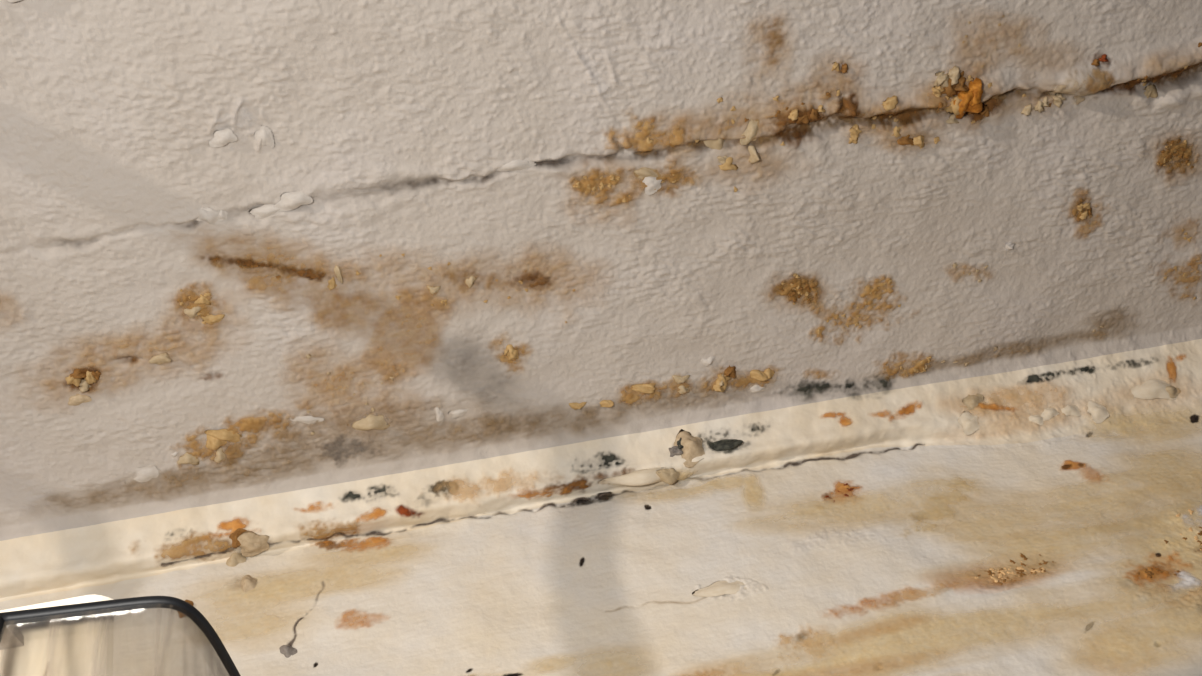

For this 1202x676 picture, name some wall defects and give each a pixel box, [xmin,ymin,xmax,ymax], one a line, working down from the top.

crack [1107,62,1202,99]
crack [605,66,1066,195]
crack [482,158,566,182]
crack [193,190,313,225]
spalling [65,355,101,406]
peeling [569,356,775,410]
crack [779,444,922,469]
water stain [1051,452,1202,518]
crack [308,491,629,540]
crack [161,550,228,566]
water stain [742,608,1065,676]